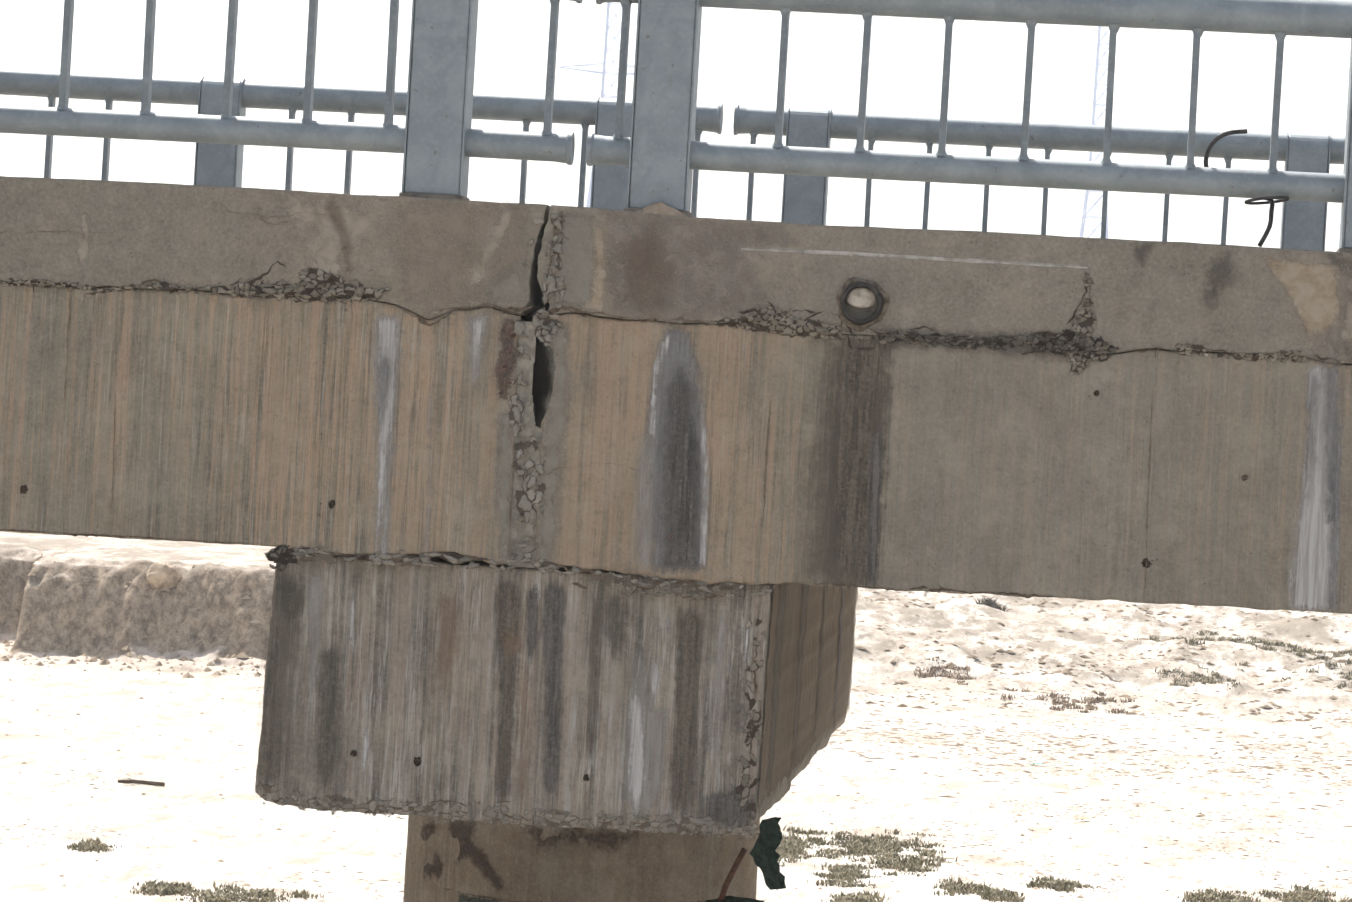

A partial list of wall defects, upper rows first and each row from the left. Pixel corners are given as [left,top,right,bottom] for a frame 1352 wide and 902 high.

peeling [1,196,394,303]
water stain [263,576,340,786]
efflorescence [374,318,399,554]
spalling [2,213,774,601]
crack [0,260,823,401]
water stain [494,581,564,800]
water stain [587,596,628,742]
water stain [627,329,891,827]
spalling [707,272,1119,375]
peeling [1175,259,1341,363]
efflorescence [1290,366,1340,611]